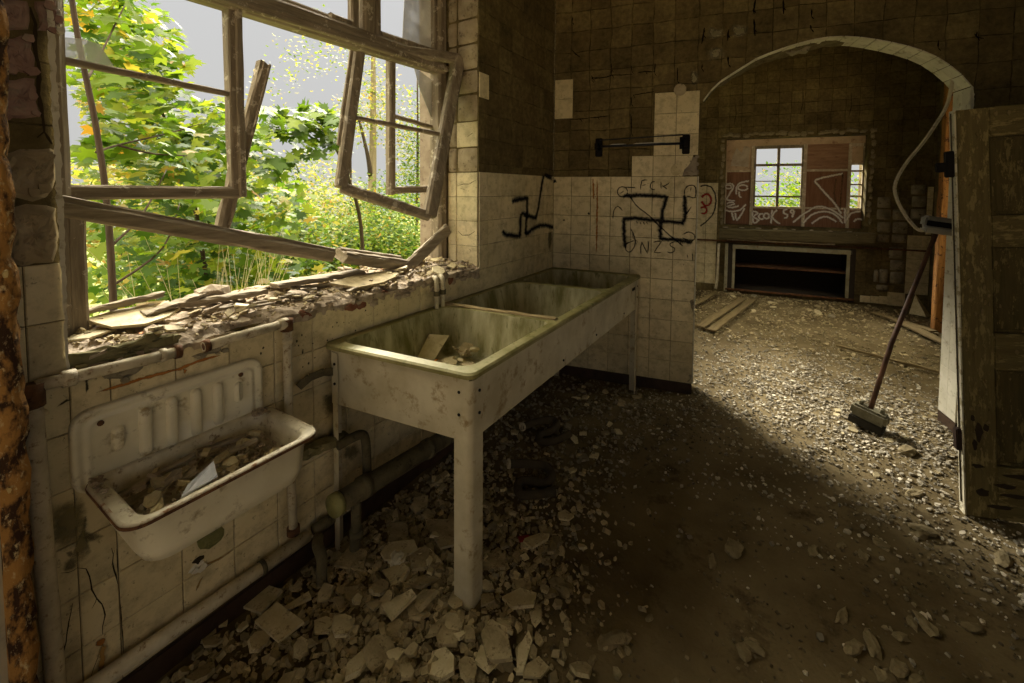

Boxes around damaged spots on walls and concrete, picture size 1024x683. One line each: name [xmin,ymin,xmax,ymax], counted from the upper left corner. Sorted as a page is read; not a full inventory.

spalling [288,270,480,319]
spalling [68,332,182,384]
rust [102,355,220,391]
crack [64,548,124,676]